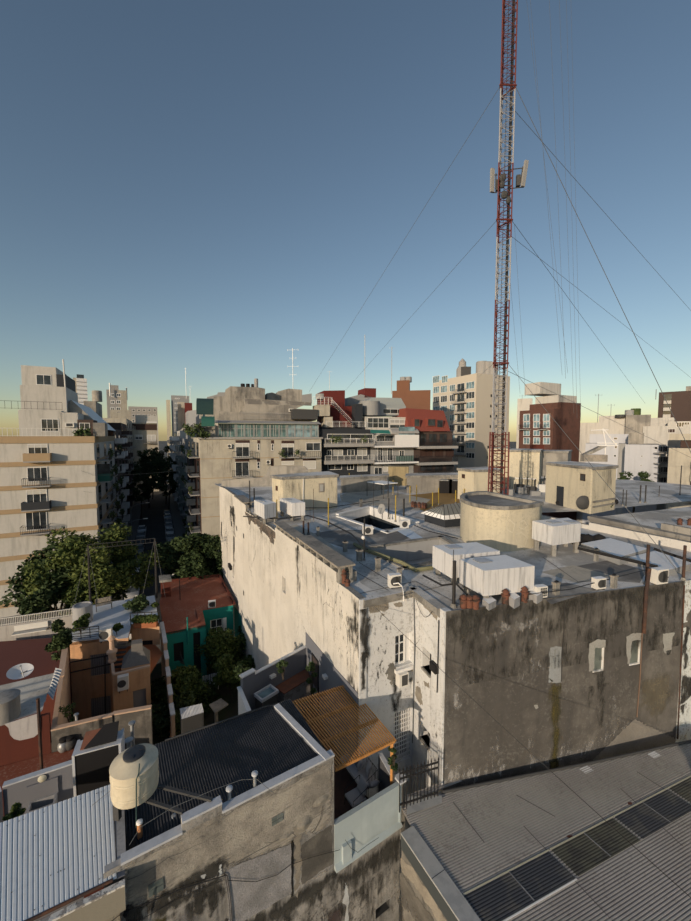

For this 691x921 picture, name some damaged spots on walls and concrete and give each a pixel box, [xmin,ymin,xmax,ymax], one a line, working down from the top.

water stain [221,506,235,561]
peeling [369,602,403,616]
water stain [337,603,402,712]
spalling [385,663,396,685]
peeling [415,681,429,705]
spalling [680,610,691,714]
water stain [127,859,227,921]
water stain [252,835,434,921]
peeling [400,858,446,921]